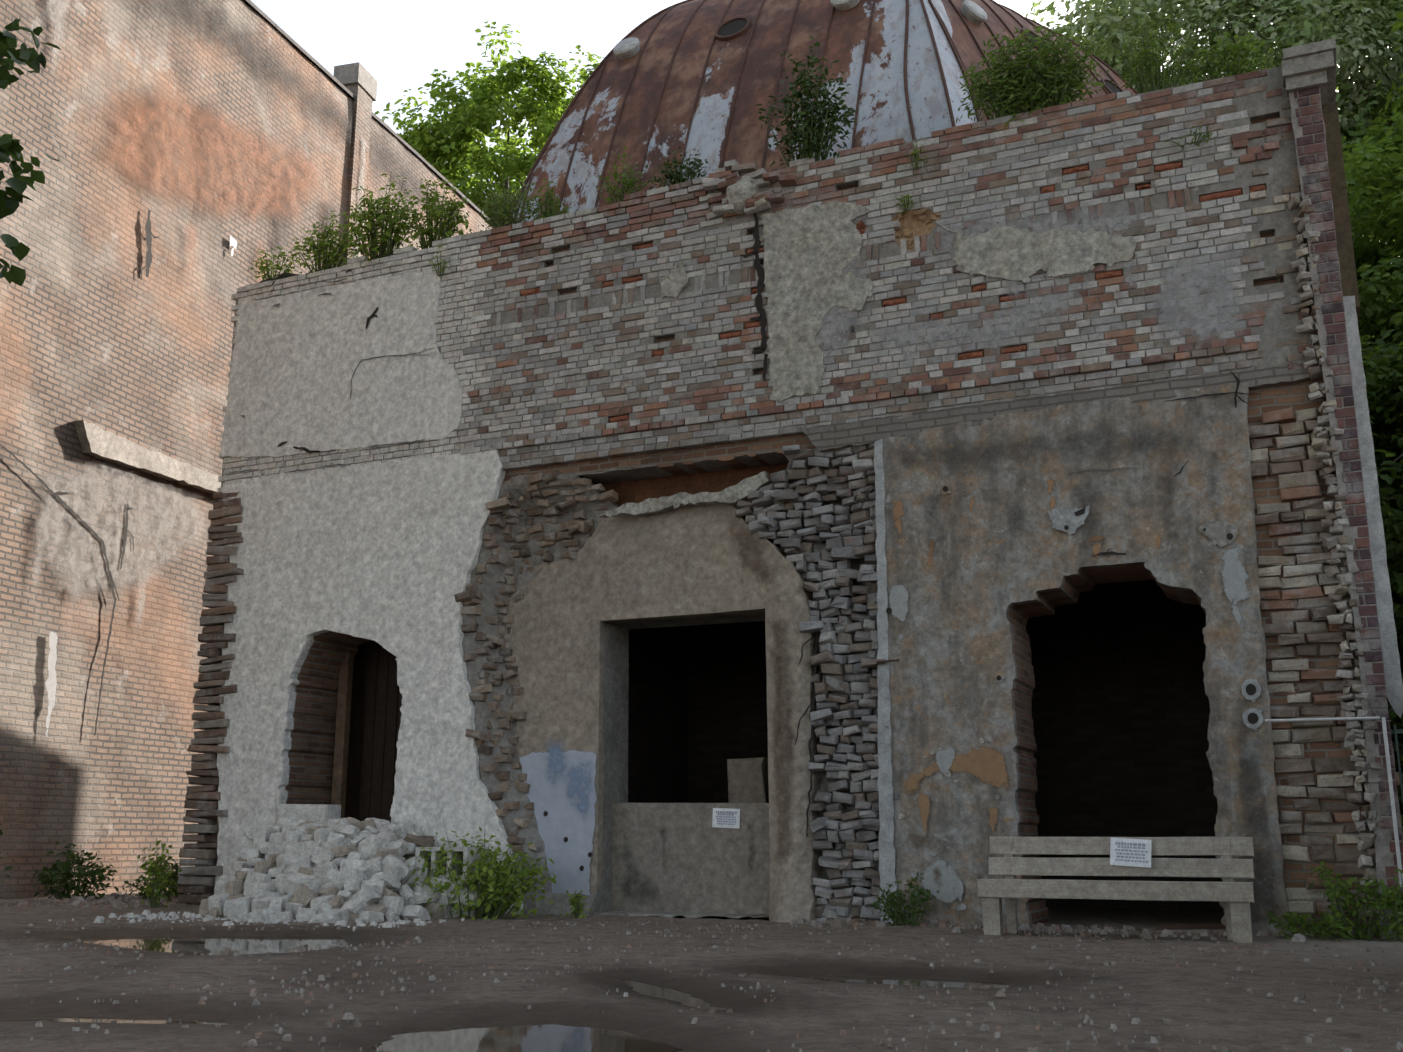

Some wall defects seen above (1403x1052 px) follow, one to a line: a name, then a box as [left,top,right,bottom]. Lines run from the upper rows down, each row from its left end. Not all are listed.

spalling [1041,164,1090,194]
spalling [1136,162,1183,191]
spalling [1199,185,1266,202]
flaking render [892,209,1137,303]
spalling [521,288,540,296]
spalling [602,276,643,288]
crack [740,213,767,381]
flaking render [720,201,907,402]
spalling [958,345,1027,360]
spalling [454,443,1010,923]